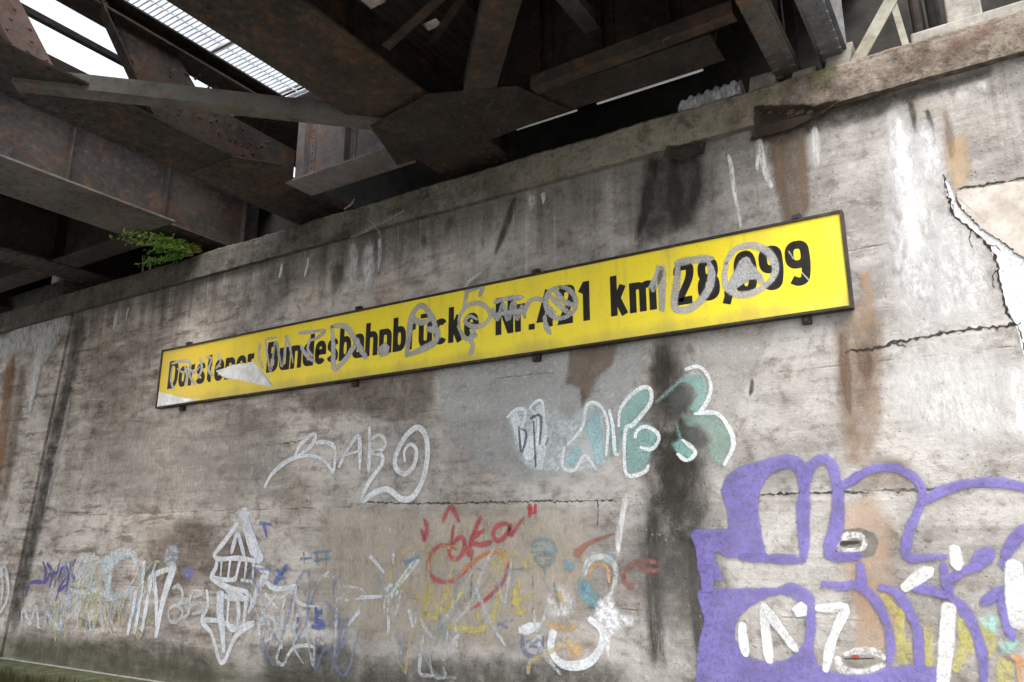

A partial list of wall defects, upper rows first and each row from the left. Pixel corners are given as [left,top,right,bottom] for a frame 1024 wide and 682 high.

water stain [638,156,702,239]
crack [845,174,1024,353]
peeling [943,181,1024,355]
rust [838,321,878,459]
crack [366,499,618,539]
water stain [644,346,708,657]
crack [760,488,934,496]